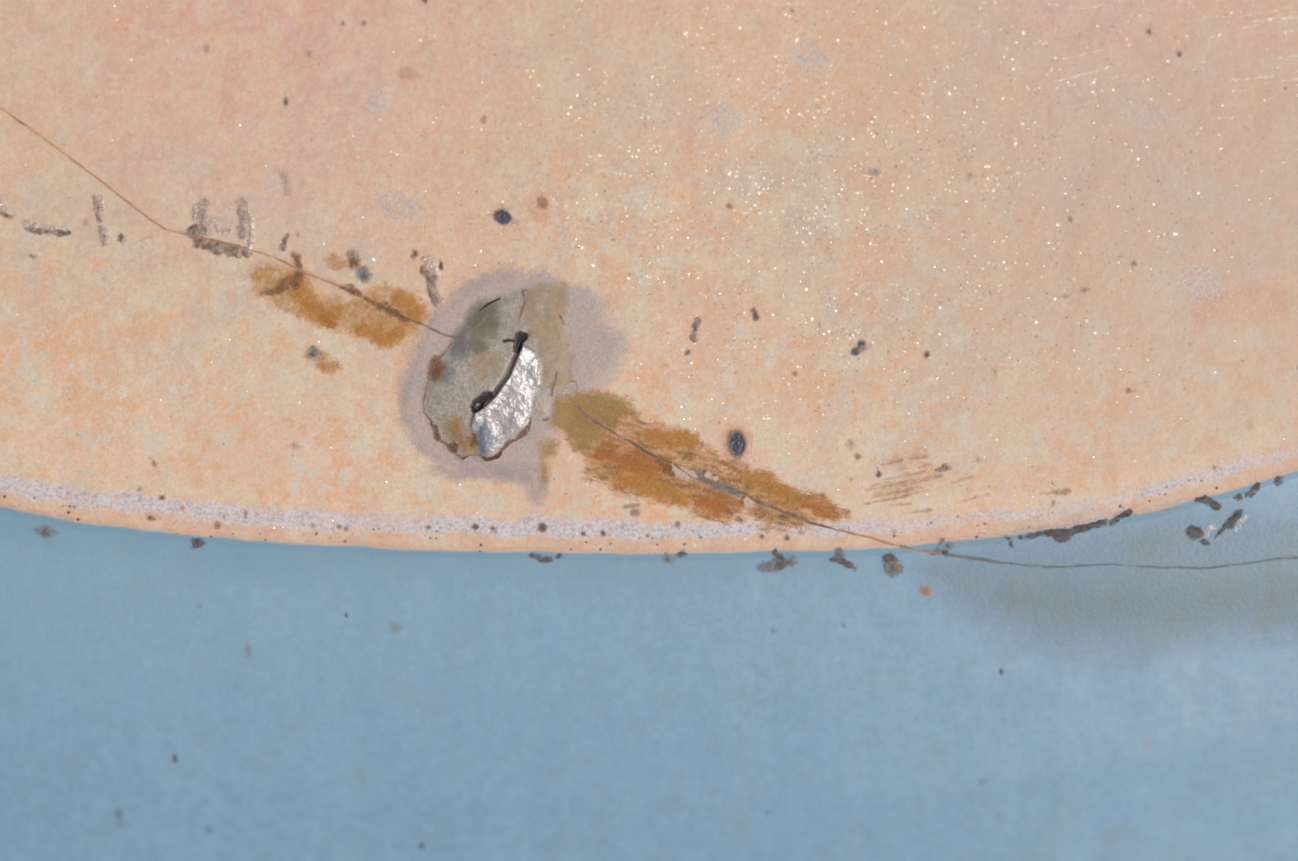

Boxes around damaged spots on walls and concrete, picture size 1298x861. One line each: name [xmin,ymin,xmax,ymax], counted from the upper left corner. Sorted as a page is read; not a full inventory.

rust [249,251,425,347]
crack [5,111,1298,569]
rust [538,388,851,532]